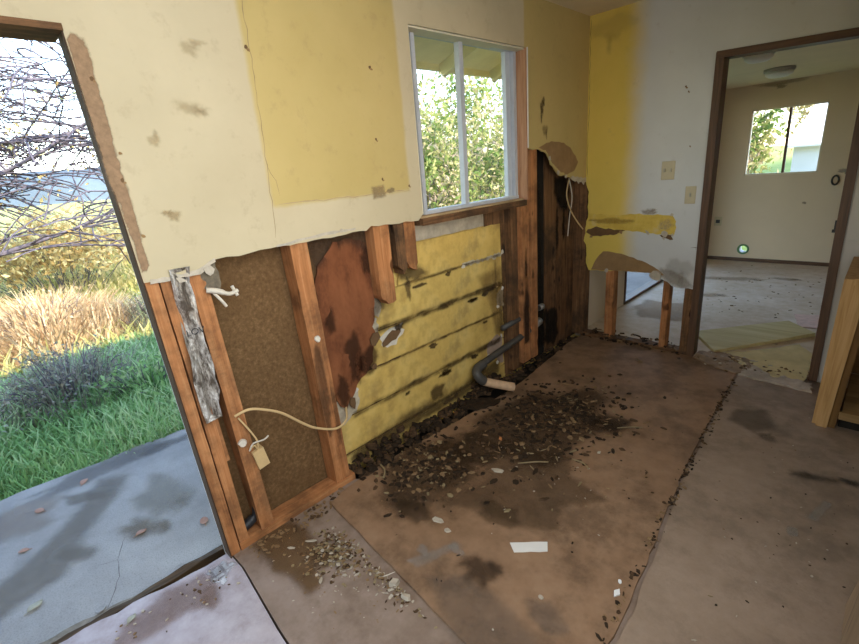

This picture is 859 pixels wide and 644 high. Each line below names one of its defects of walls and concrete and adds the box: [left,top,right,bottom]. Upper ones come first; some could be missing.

crack [242,2,409,238]
peeling [373,180,394,198]
peeling [589,213,676,240]
water stain [311,232,367,263]
peeling [461,249,504,268]
spalling [372,298,404,347]
peeling [337,388,360,425]
water stain [389,392,628,519]
water stain [0,436,187,615]
water stain [465,557,501,585]